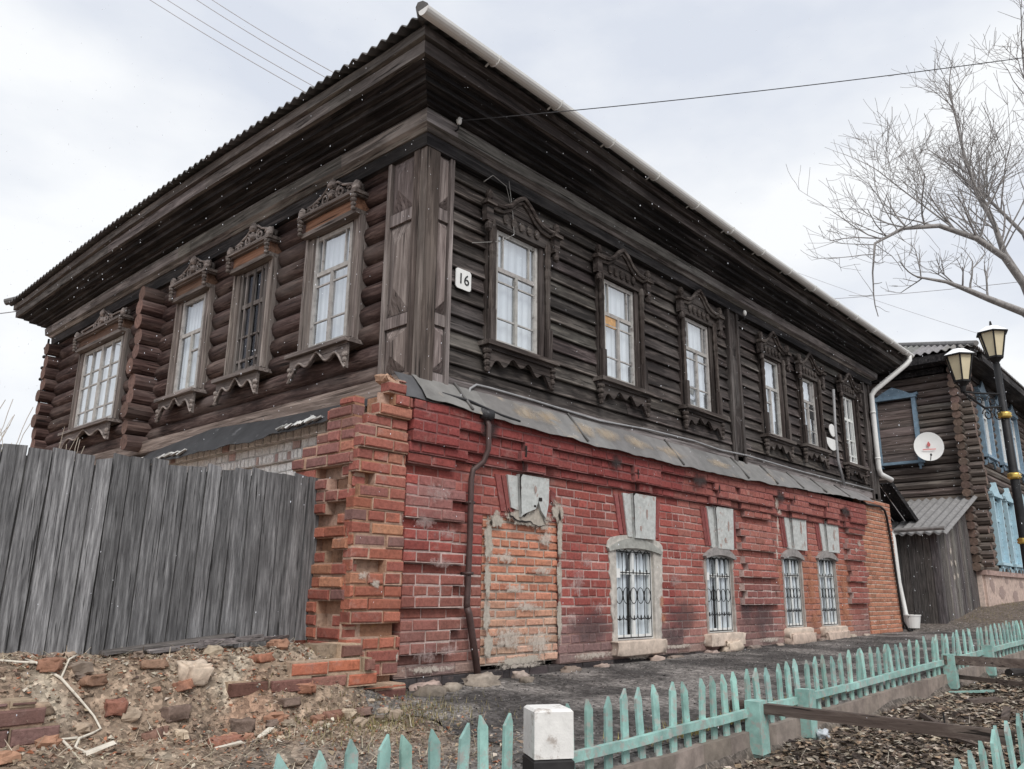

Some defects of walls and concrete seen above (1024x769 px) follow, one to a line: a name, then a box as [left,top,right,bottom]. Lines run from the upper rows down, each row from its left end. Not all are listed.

flaking render [483,486,563,669]